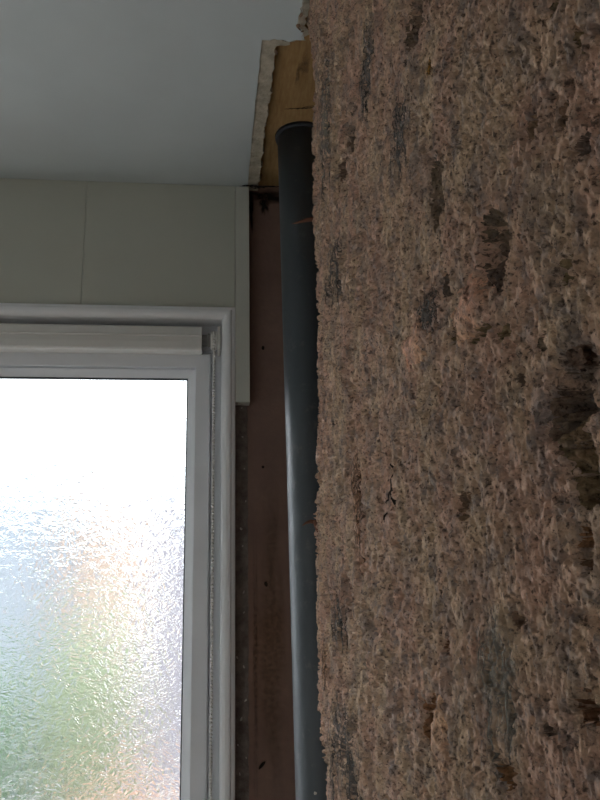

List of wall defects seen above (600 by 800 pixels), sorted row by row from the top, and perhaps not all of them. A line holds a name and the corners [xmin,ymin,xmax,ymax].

crack [383,463,396,520]